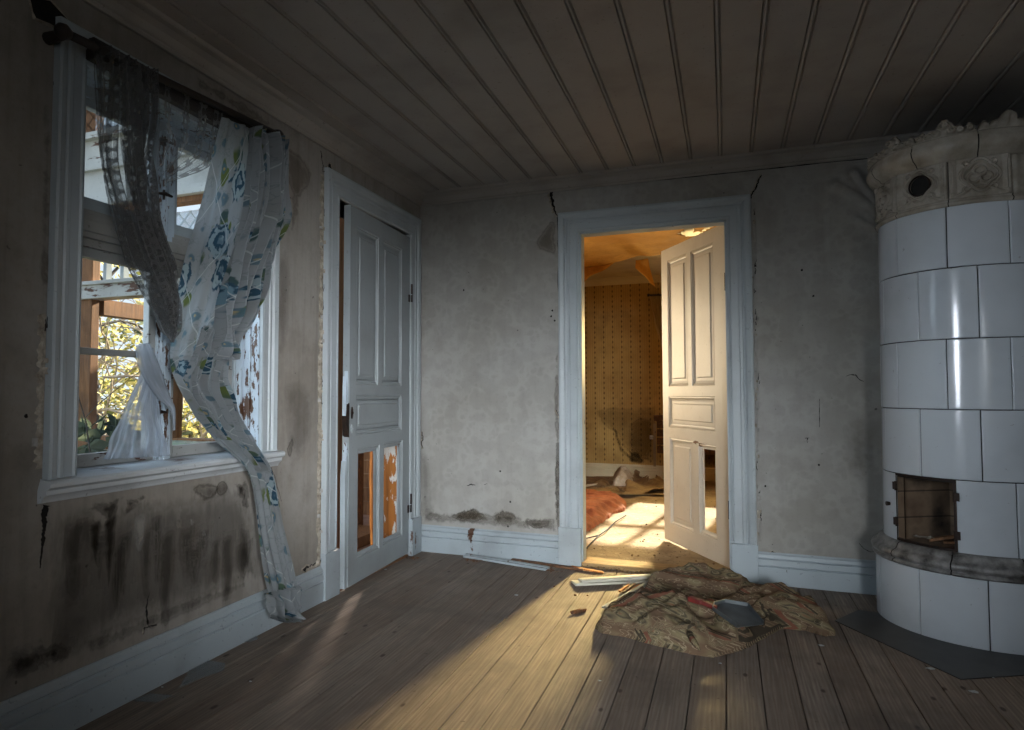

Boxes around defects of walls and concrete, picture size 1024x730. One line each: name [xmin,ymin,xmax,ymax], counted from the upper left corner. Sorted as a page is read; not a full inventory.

crack [656,158,867,198]
crack [547,192,558,244]
crack [39,505,49,568]
damp [92,504,115,569]